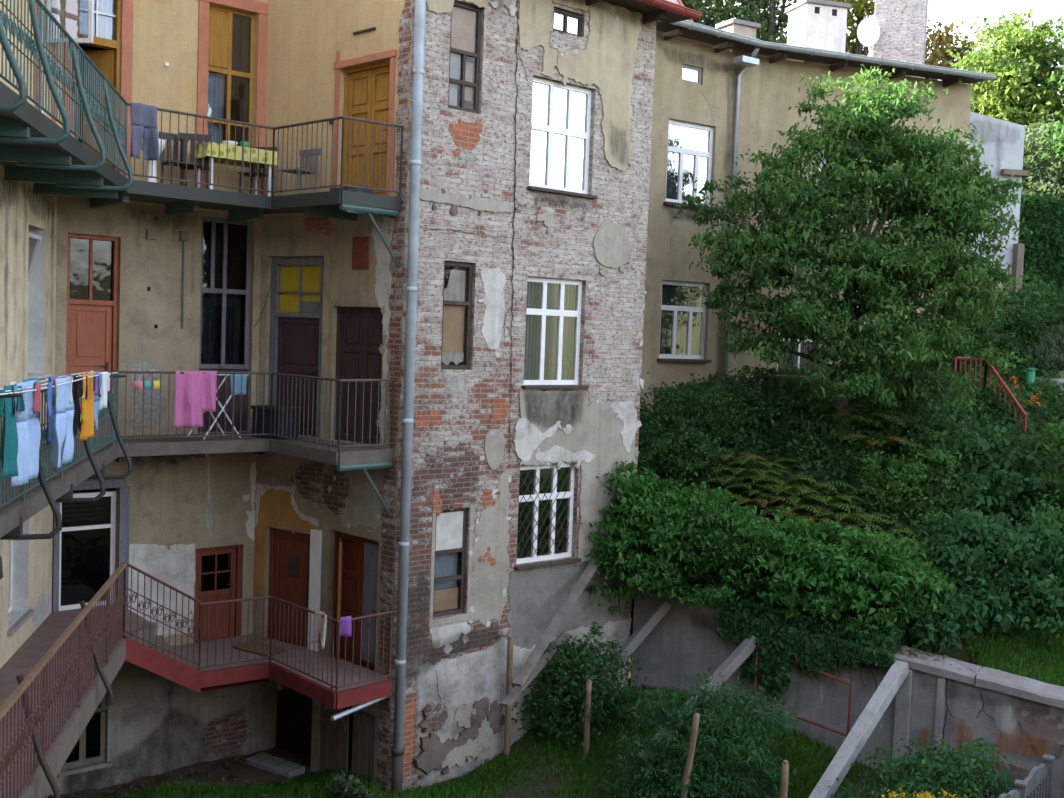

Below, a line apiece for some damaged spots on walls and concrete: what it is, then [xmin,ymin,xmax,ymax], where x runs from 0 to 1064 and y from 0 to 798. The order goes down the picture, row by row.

spalling [448,119,483,157]
spalling [420,188,518,216]
crack [423,0,527,463]
flaking render [371,0,412,675]
peeling [489,396,595,470]
peeling [596,399,642,457]
flaking render [242,461,352,541]
spalling [403,697,505,780]
crack [942,678,1003,760]